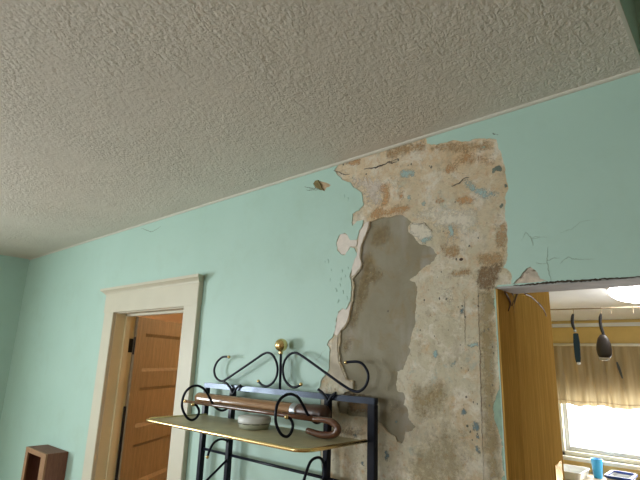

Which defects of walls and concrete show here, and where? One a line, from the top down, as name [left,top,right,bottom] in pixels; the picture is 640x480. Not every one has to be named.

peeling [320,133,546,480]
crack [513,232,640,286]